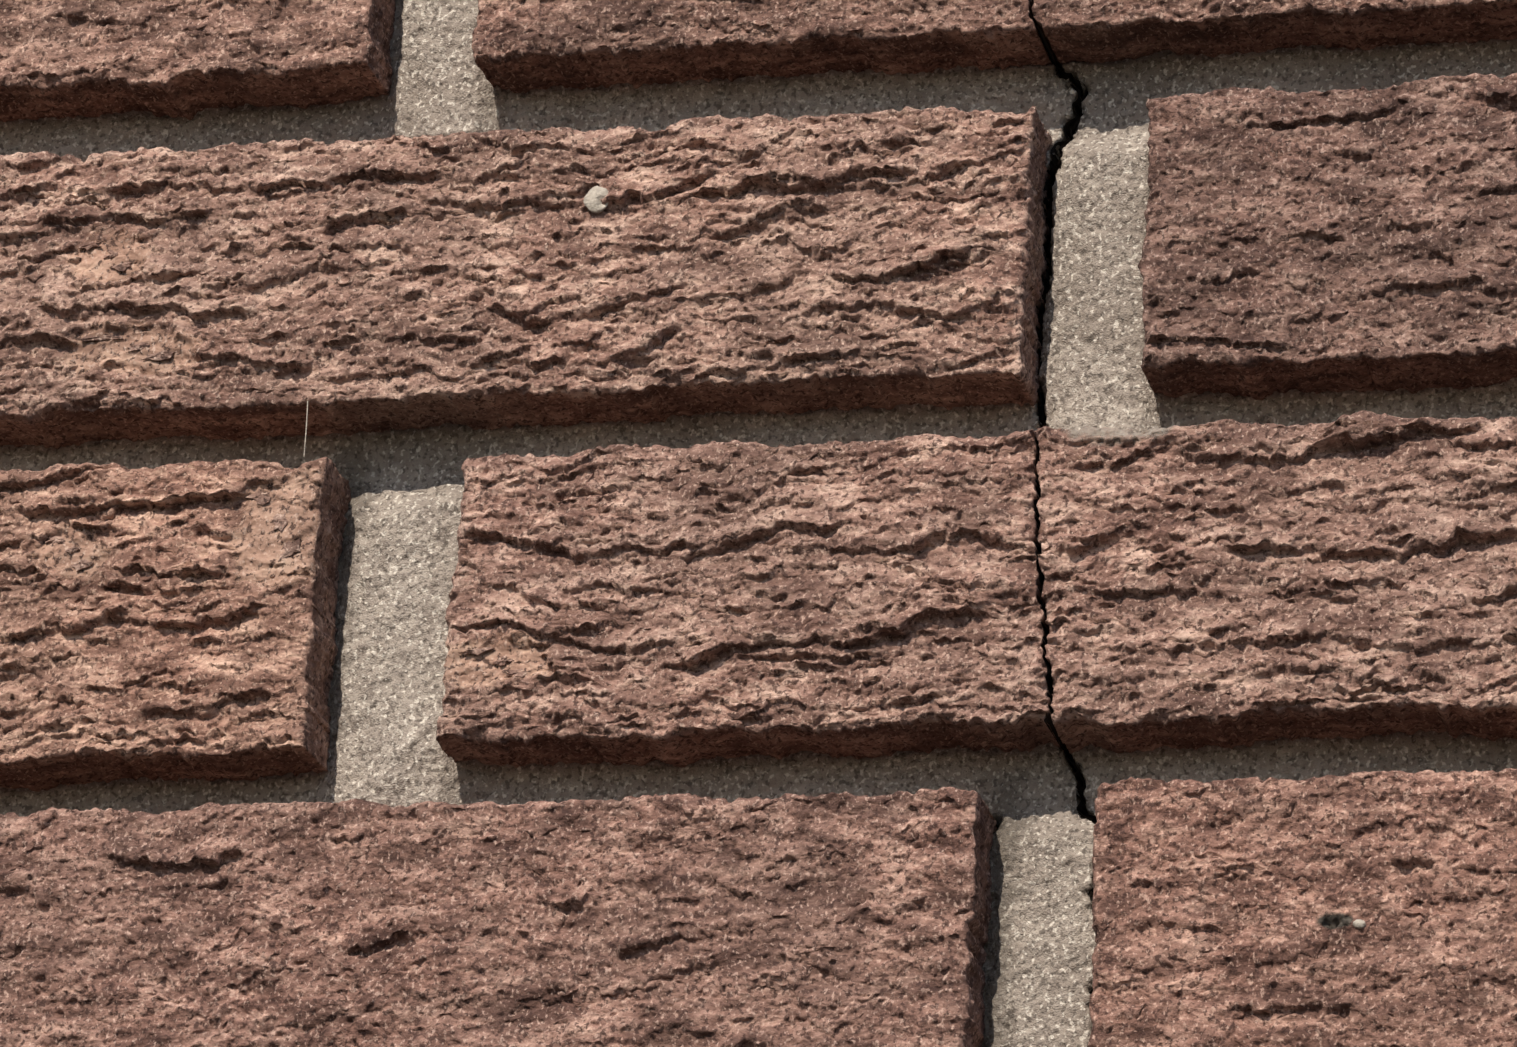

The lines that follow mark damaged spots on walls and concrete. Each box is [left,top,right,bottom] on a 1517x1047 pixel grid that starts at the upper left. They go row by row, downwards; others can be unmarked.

crack [1029,0,1097,824]